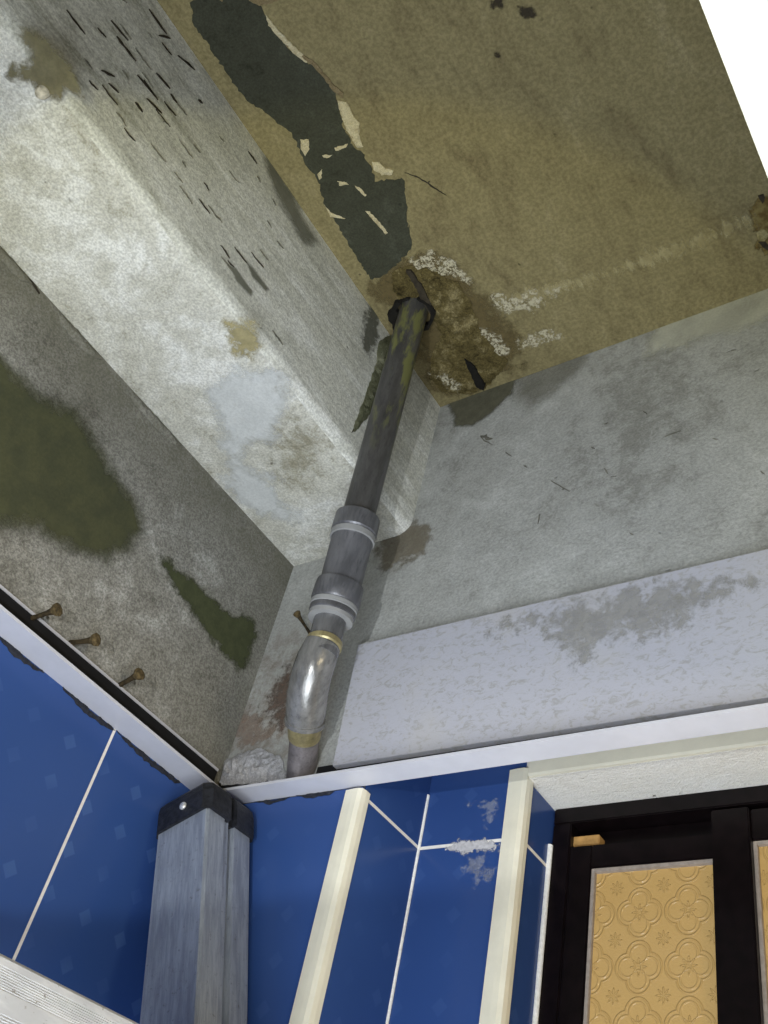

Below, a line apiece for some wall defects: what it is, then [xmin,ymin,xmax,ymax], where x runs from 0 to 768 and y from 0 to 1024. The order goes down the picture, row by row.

spalling [517,6,536,19]
peeling [190,0,525,396]
water stain [0,357,141,560]
corrosion [235,665,290,745]